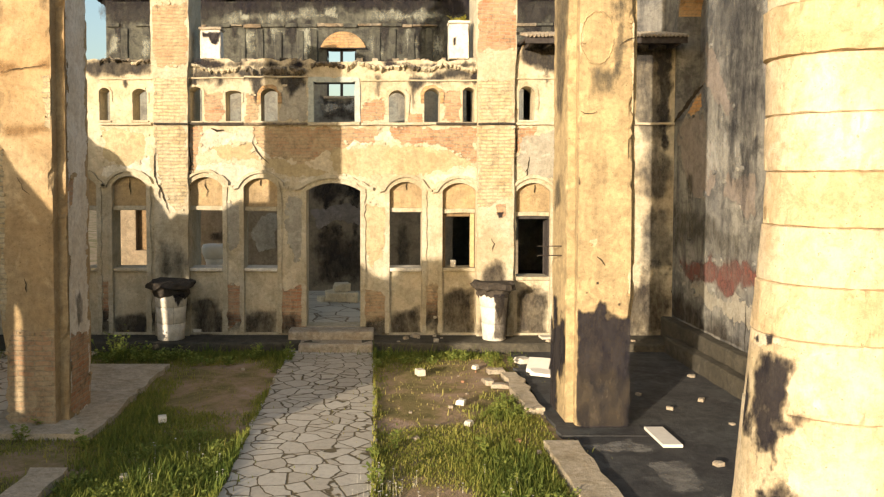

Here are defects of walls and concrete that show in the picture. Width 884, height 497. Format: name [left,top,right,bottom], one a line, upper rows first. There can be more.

peeling [65,0,92,416]
crack [154,153,169,211]
crack [189,127,208,196]
peeling [99,0,554,268]
water stain [630,48,739,346]
water stain [483,262,504,281]
peeling [226,283,241,330]
peeling [282,285,306,330]
water stain [366,289,482,335]
water stain [508,288,564,406]
water stain [577,375,630,426]
peeling [679,256,800,497]